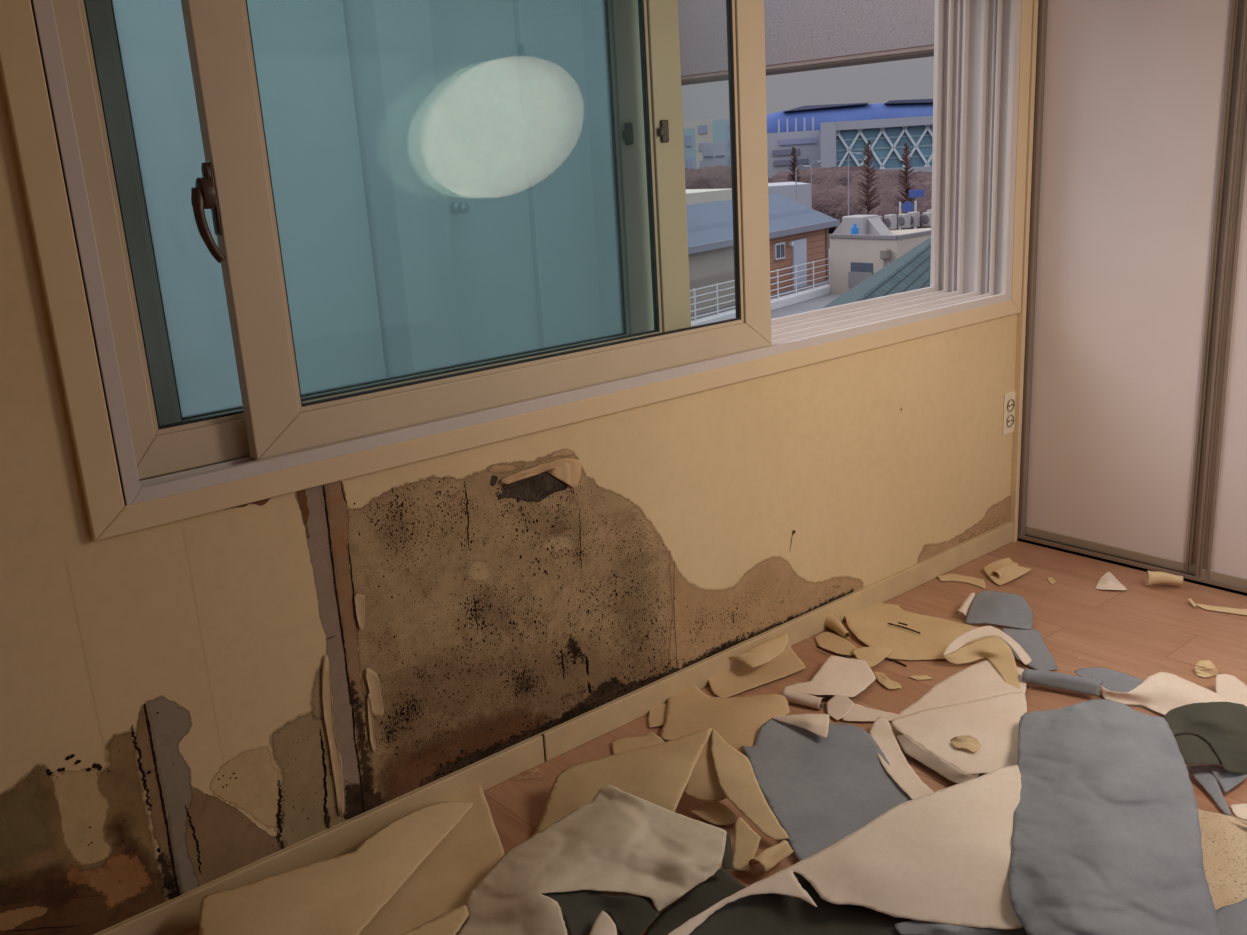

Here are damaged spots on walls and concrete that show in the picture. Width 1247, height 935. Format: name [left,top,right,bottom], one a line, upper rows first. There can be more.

spalling [490,458,582,502]
peeling [66,696,199,910]
peeling [295,481,374,821]
leakage [0,453,863,935]